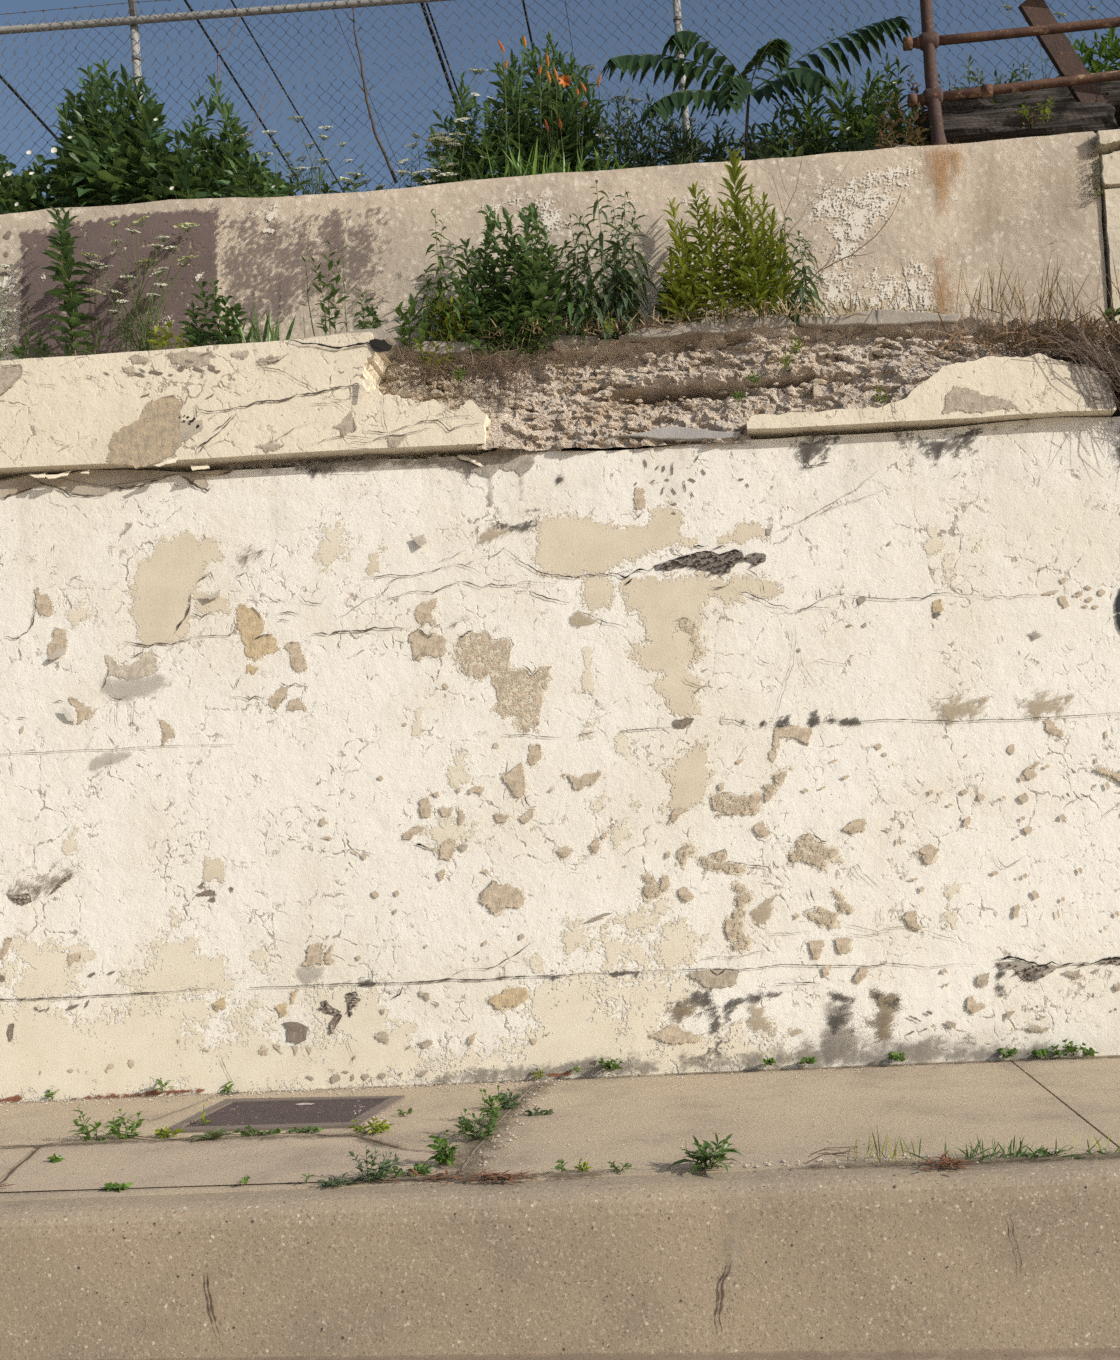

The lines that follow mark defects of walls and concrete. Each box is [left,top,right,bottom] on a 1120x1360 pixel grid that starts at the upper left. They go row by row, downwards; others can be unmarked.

peeling [0,393,229,498]
peeling [34,586,96,661]
peeling [105,529,308,681]
spalling [357,316,1120,881]
crack [828,712,1120,722]
spalling [2,827,80,906]
crack [0,988,210,1000]
peeling [0,841,813,1103]
crack [250,865,964,998]
peeling [795,887,854,978]
damp [666,988,1081,1071]
spalling [963,956,1120,1016]